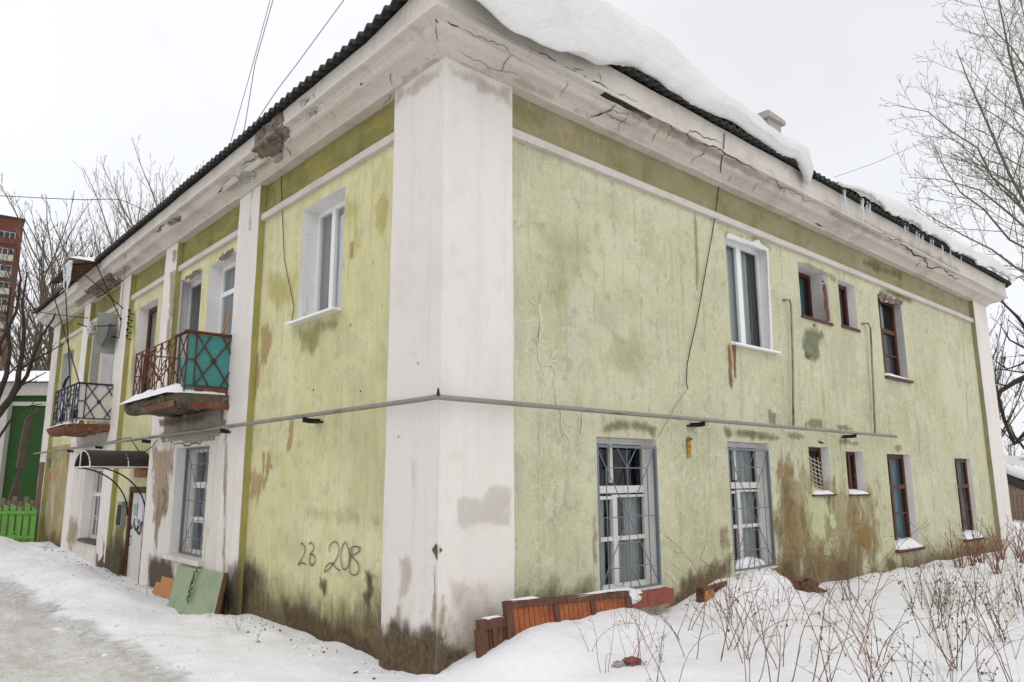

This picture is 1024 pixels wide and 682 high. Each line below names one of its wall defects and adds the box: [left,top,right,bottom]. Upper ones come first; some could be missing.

spalling [251,112,291,164]
crack [435,20,822,227]
spalling [234,171,256,185]
crack [879,233,960,279]
spalling [83,272,127,298]
leakage [803,324,823,360]
rust [728,345,736,388]
flaking render [152,420,226,525]
leakage [783,489,861,583]
leakage [888,543,995,571]
leakage [222,563,381,660]